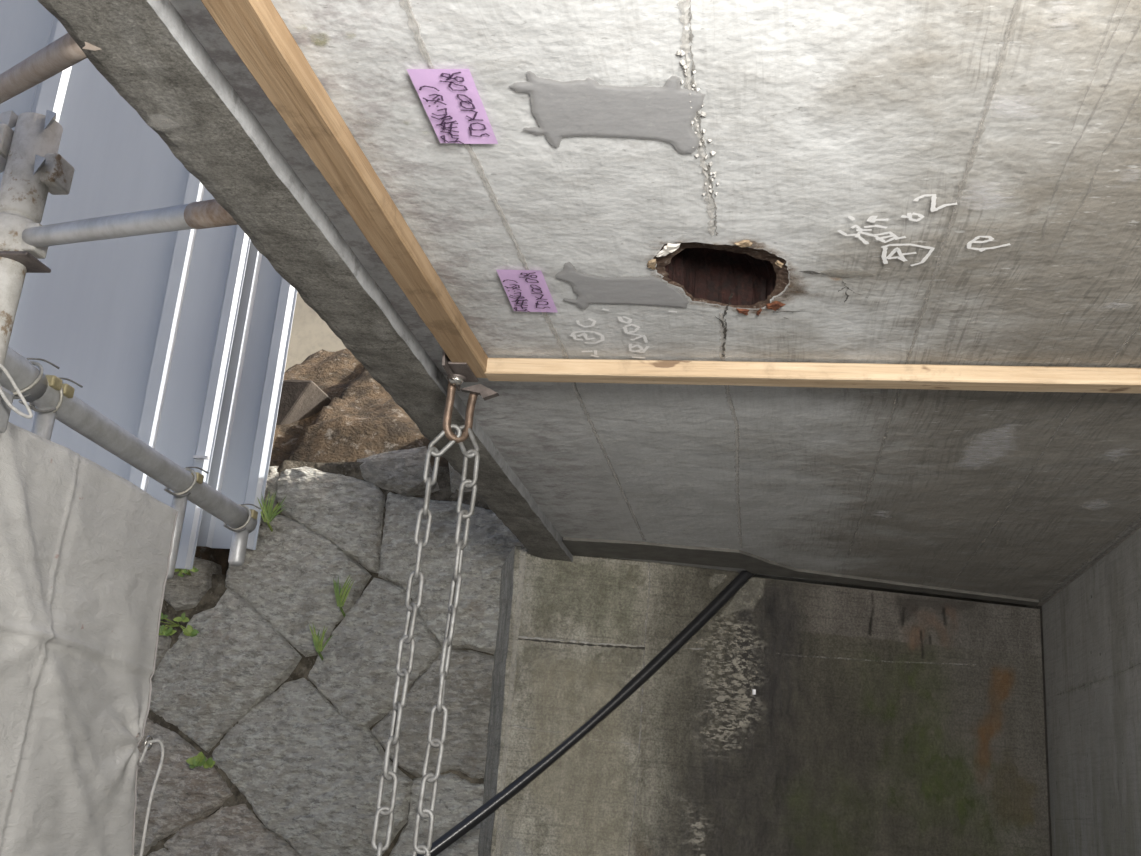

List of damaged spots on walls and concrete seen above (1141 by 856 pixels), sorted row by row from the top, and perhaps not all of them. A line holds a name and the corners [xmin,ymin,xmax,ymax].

crack [676,0,719,236]
crack [715,293,733,357]
spalling [647,240,874,316]
water stain [692,599,789,856]